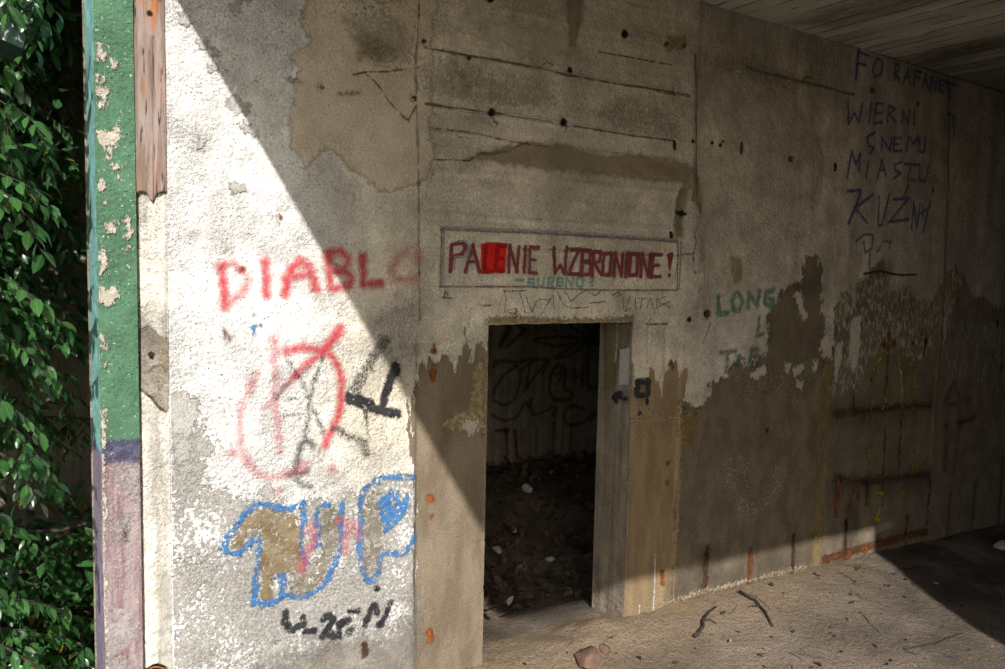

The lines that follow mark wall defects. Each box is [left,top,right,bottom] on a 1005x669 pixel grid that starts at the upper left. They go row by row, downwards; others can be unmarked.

peeling [94,41,122,110]
peeling [288,0,438,193]
peeling [96,123,125,205]
peeling [98,216,135,307]
peeling [623,254,1005,617]
rust [823,332,931,564]
rust [702,546,711,588]